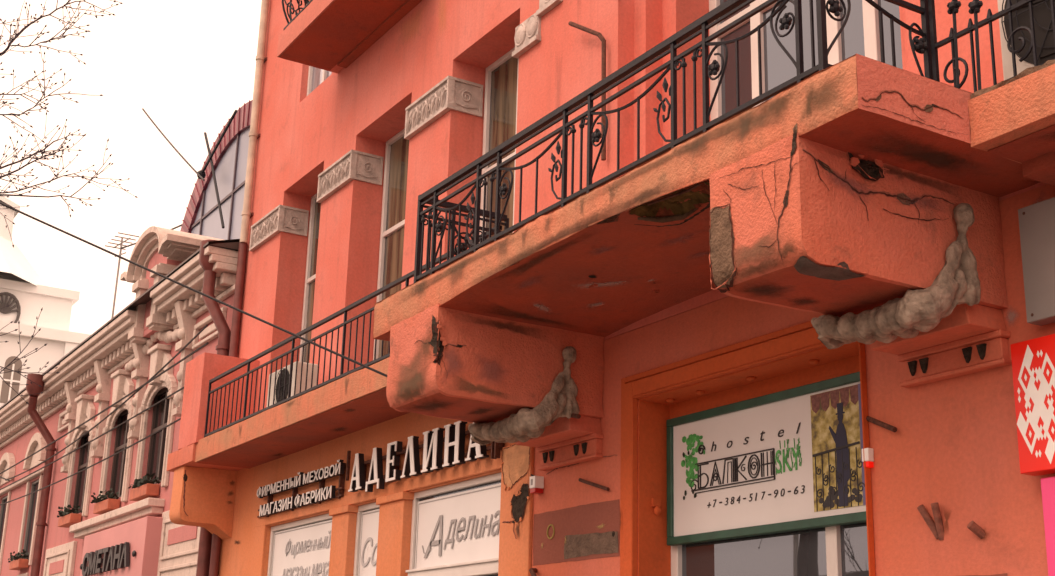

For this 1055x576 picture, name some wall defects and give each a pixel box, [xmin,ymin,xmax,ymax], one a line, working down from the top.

damp [617,98,783,185]
crack [718,123,954,262]
hole [847,152,886,181]
crack [862,90,965,135]
spalling [629,181,736,293]
spalling [430,316,448,365]
peeling [500,444,530,523]